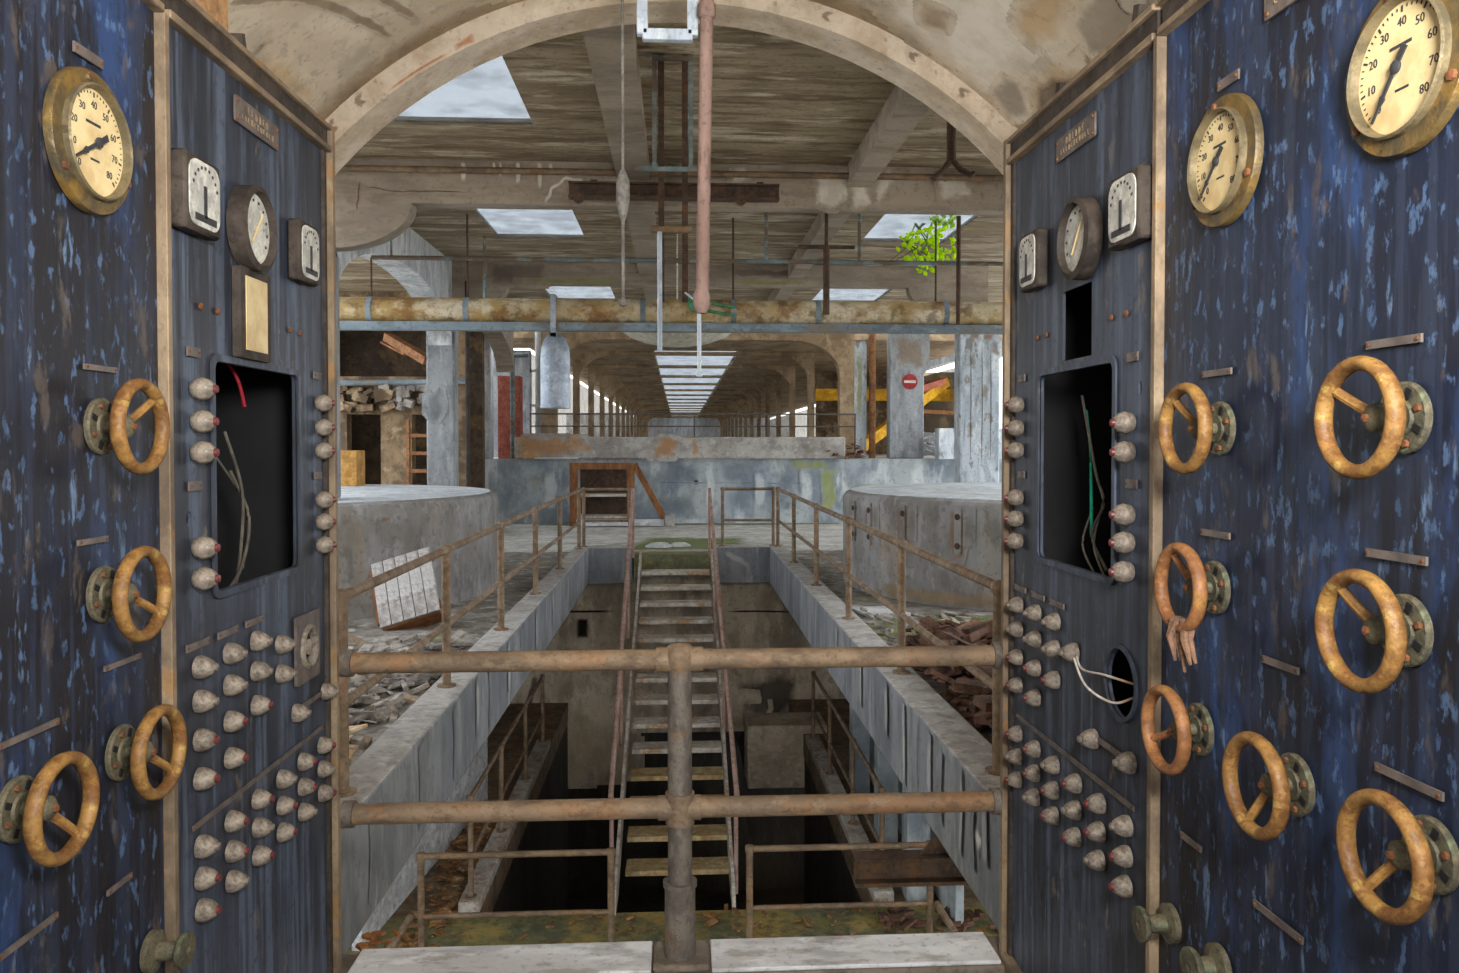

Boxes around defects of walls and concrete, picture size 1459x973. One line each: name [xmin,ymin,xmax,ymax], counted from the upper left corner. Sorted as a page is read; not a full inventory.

rust [516,433,595,460]
rust [647,433,699,462]